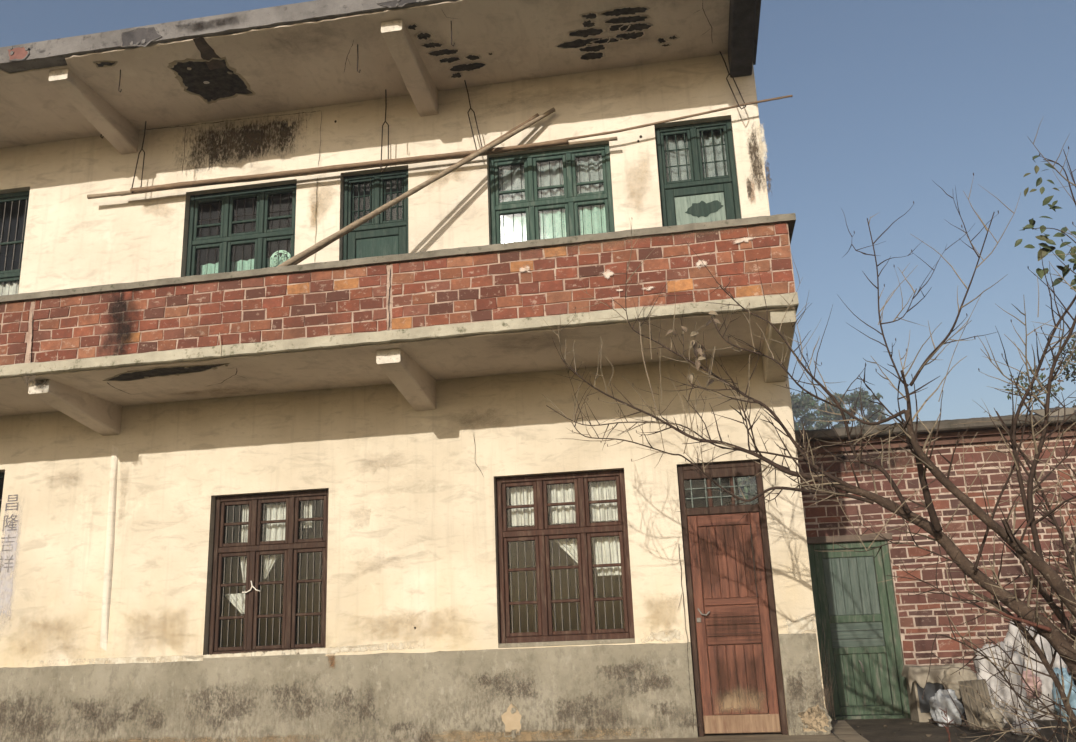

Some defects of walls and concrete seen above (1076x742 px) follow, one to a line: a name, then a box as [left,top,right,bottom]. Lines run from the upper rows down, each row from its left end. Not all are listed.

spalling [167,37,256,104]
spalling [405,23,494,79]
spalling [555,5,680,61]
leakage [181,119,299,171]
spalling [102,363,230,394]